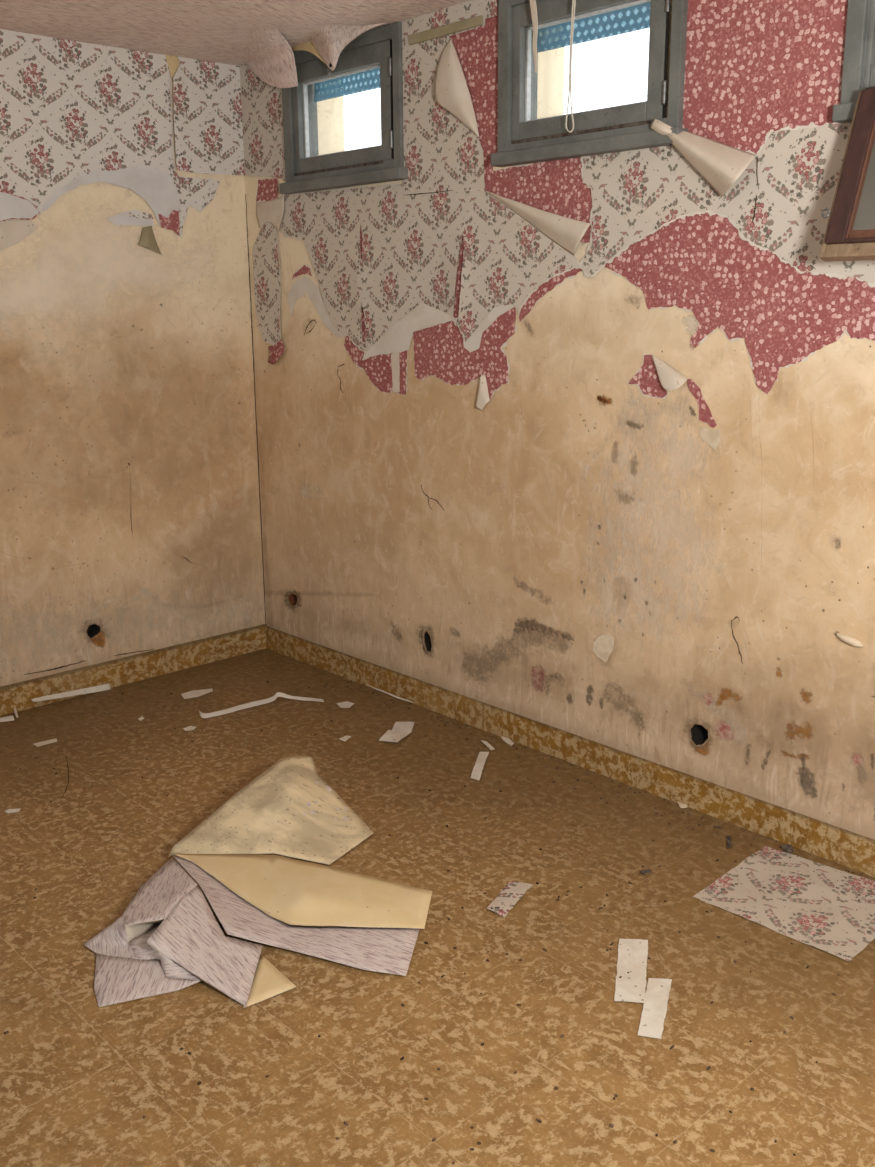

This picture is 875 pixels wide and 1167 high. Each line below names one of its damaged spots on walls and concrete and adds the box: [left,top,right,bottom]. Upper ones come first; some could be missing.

water stain [514,620,572,641]